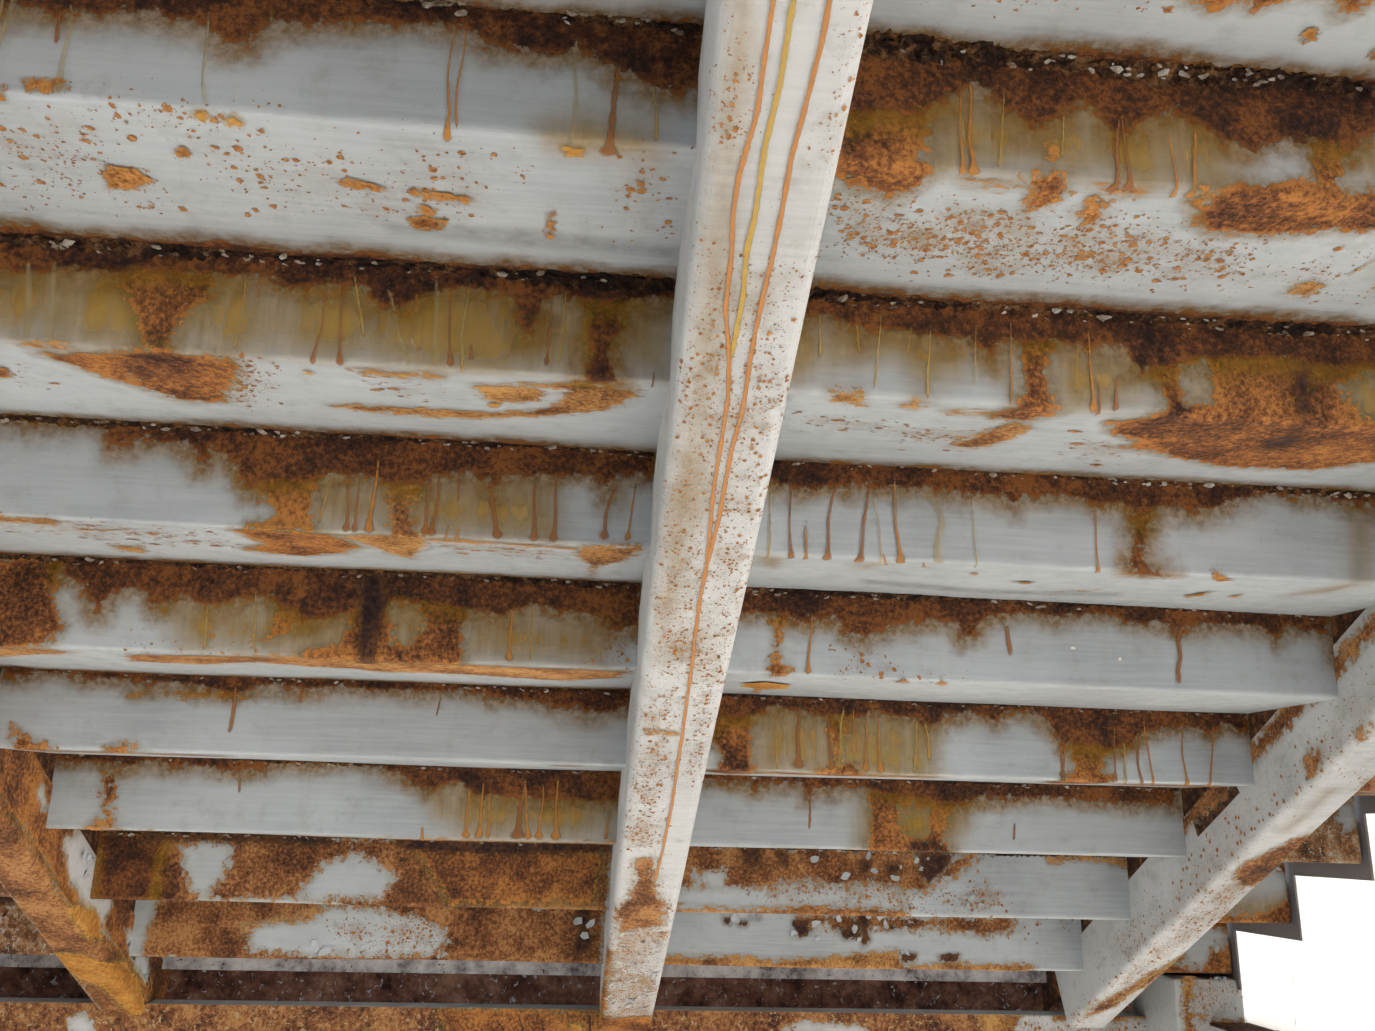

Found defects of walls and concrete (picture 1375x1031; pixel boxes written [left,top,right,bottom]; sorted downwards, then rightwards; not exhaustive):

corrosion [838,25,973,44]
corrosion [1298,28,1321,45]
corrosion [994,40,1375,83]
corrosion [789,53,1375,304]
corrosion [0,0,717,420]